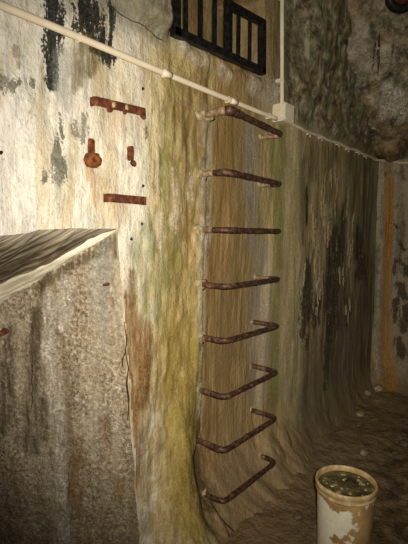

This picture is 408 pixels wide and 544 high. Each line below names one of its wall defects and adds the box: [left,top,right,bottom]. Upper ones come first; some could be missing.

water stain [41,28,65,92]
water stain [38,0,116,48]
water stain [73,42,117,91]
water stain [170,168,180,234]
corrosion [376,165,397,392]
water stain [389,255,408,362]
crack [122,322,133,420]
corrosion [124,270,152,486]